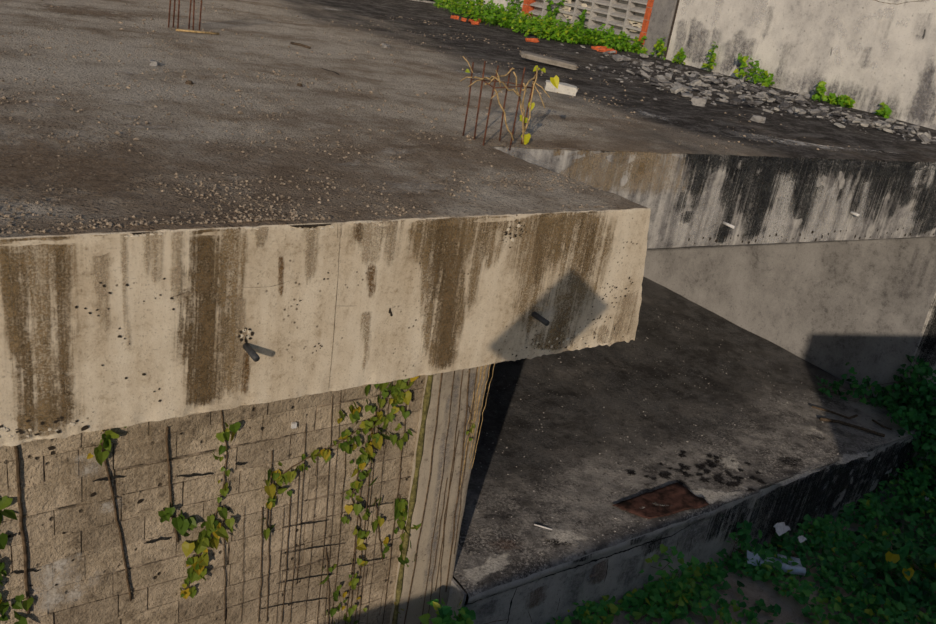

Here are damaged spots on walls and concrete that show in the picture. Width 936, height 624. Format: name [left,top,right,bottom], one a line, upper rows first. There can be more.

water stain [0,236,75,440]
water stain [145,227,268,405]
water stain [305,227,317,277]
water stain [353,211,613,369]
water stain [561,139,936,245]
water stain [914,299,936,367]